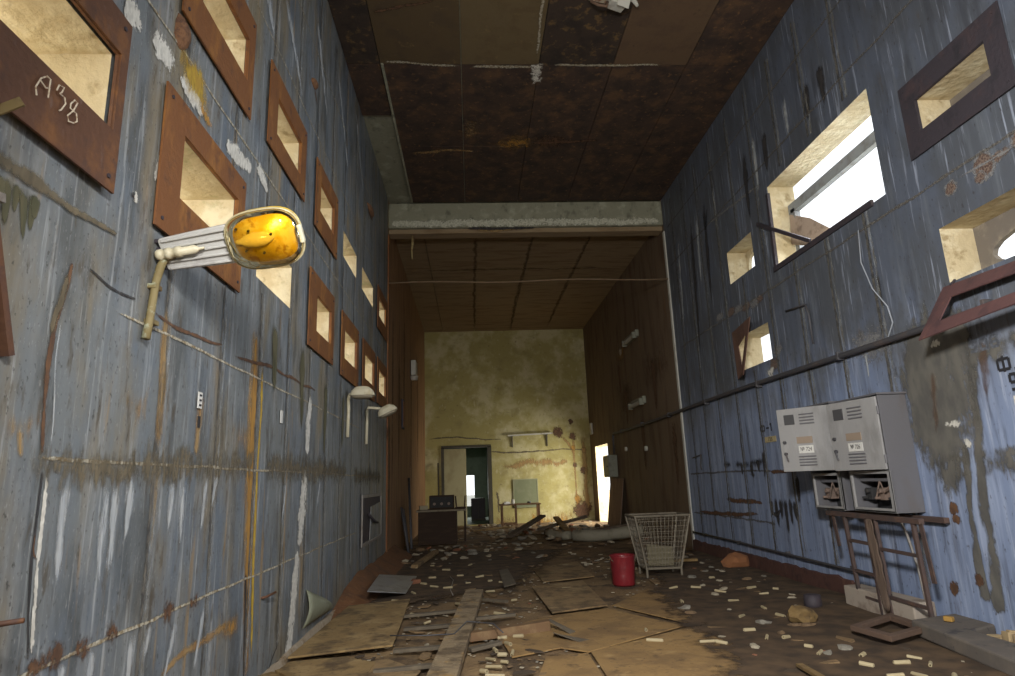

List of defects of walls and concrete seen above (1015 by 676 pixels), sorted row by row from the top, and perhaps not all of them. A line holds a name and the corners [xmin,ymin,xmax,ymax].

leakage [40,443,253,577]
leakage [267,387,380,517]
rust [28,642,63,676]